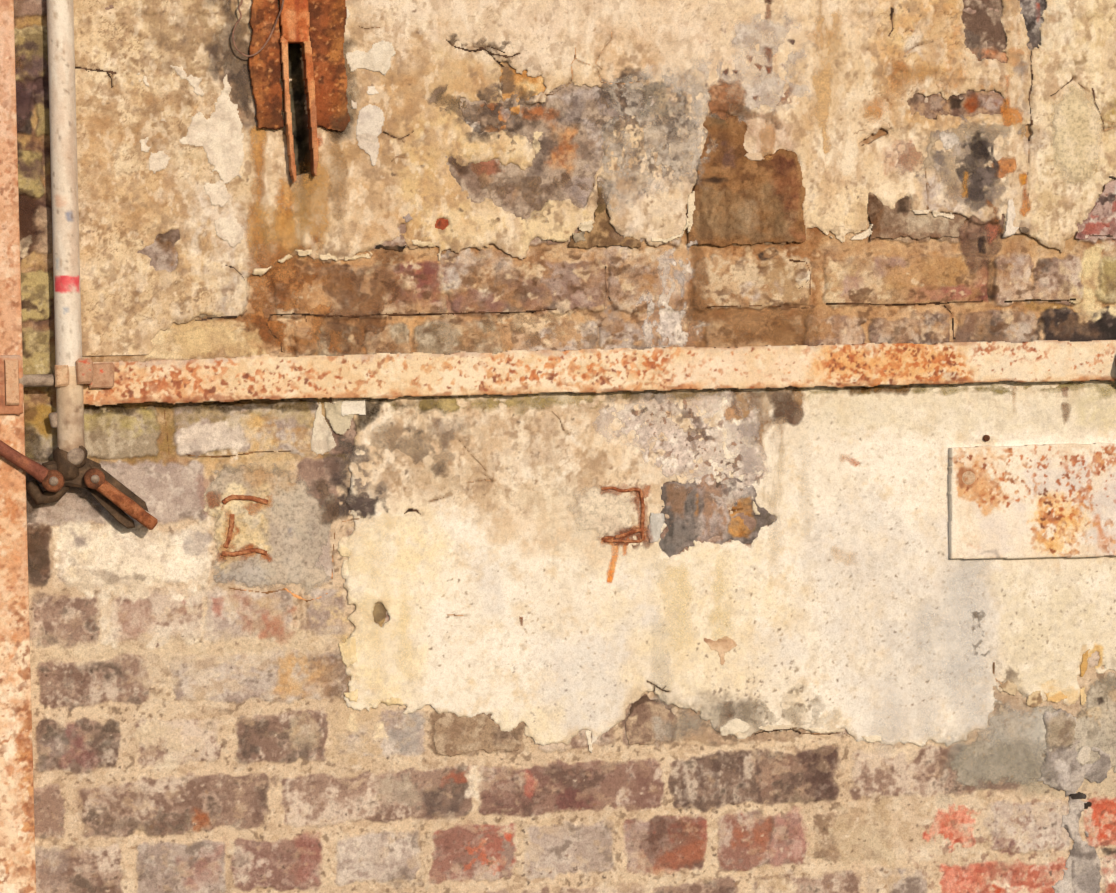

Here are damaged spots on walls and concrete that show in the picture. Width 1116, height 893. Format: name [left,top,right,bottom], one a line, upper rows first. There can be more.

spalling [907,90,1005,119]
peeling [170,65,244,248]
spalling [445,62,806,249]
spalling [851,192,967,242]
damp [246,253,399,353]
peeling [311,399,366,455]
rust [221,514,272,562]
rust [607,486,650,582]
spalling [647,472,777,558]
spalling [373,602,387,627]
spalling [433,714,534,757]
spalling [626,694,678,745]